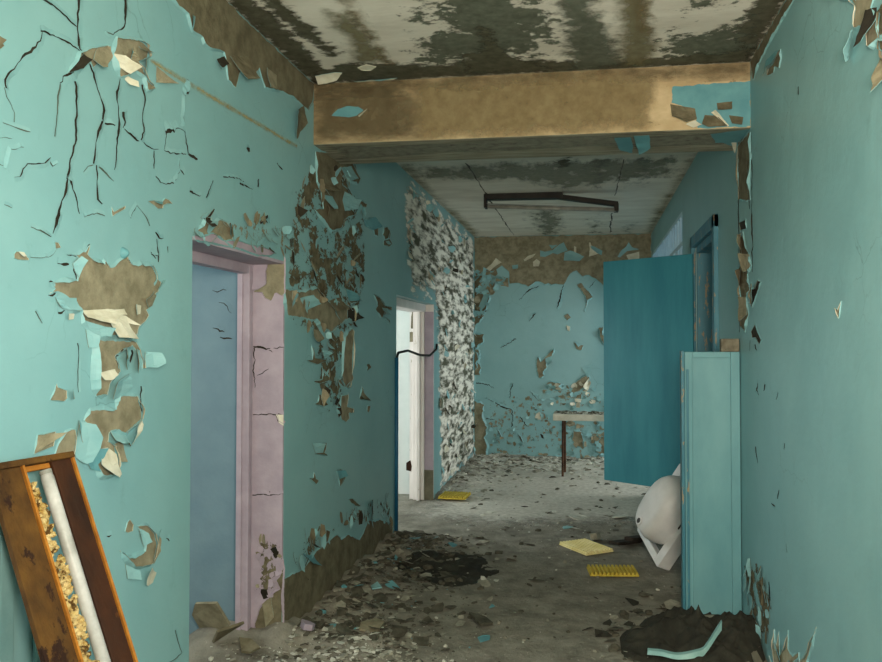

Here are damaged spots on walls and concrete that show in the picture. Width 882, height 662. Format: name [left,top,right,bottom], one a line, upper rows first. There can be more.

crack [0,0,260,323]
damp [230,0,784,188]
peeling [840,0,882,92]
peeling [33,245,166,480]
crack [212,286,235,339]
crack [252,342,284,388]
crack [253,409,285,424]
peeling [193,150,392,423]
peeling [404,176,652,487]
crack [252,489,283,497]
spalling [253,493,393,628]
peeling [742,558,817,662]